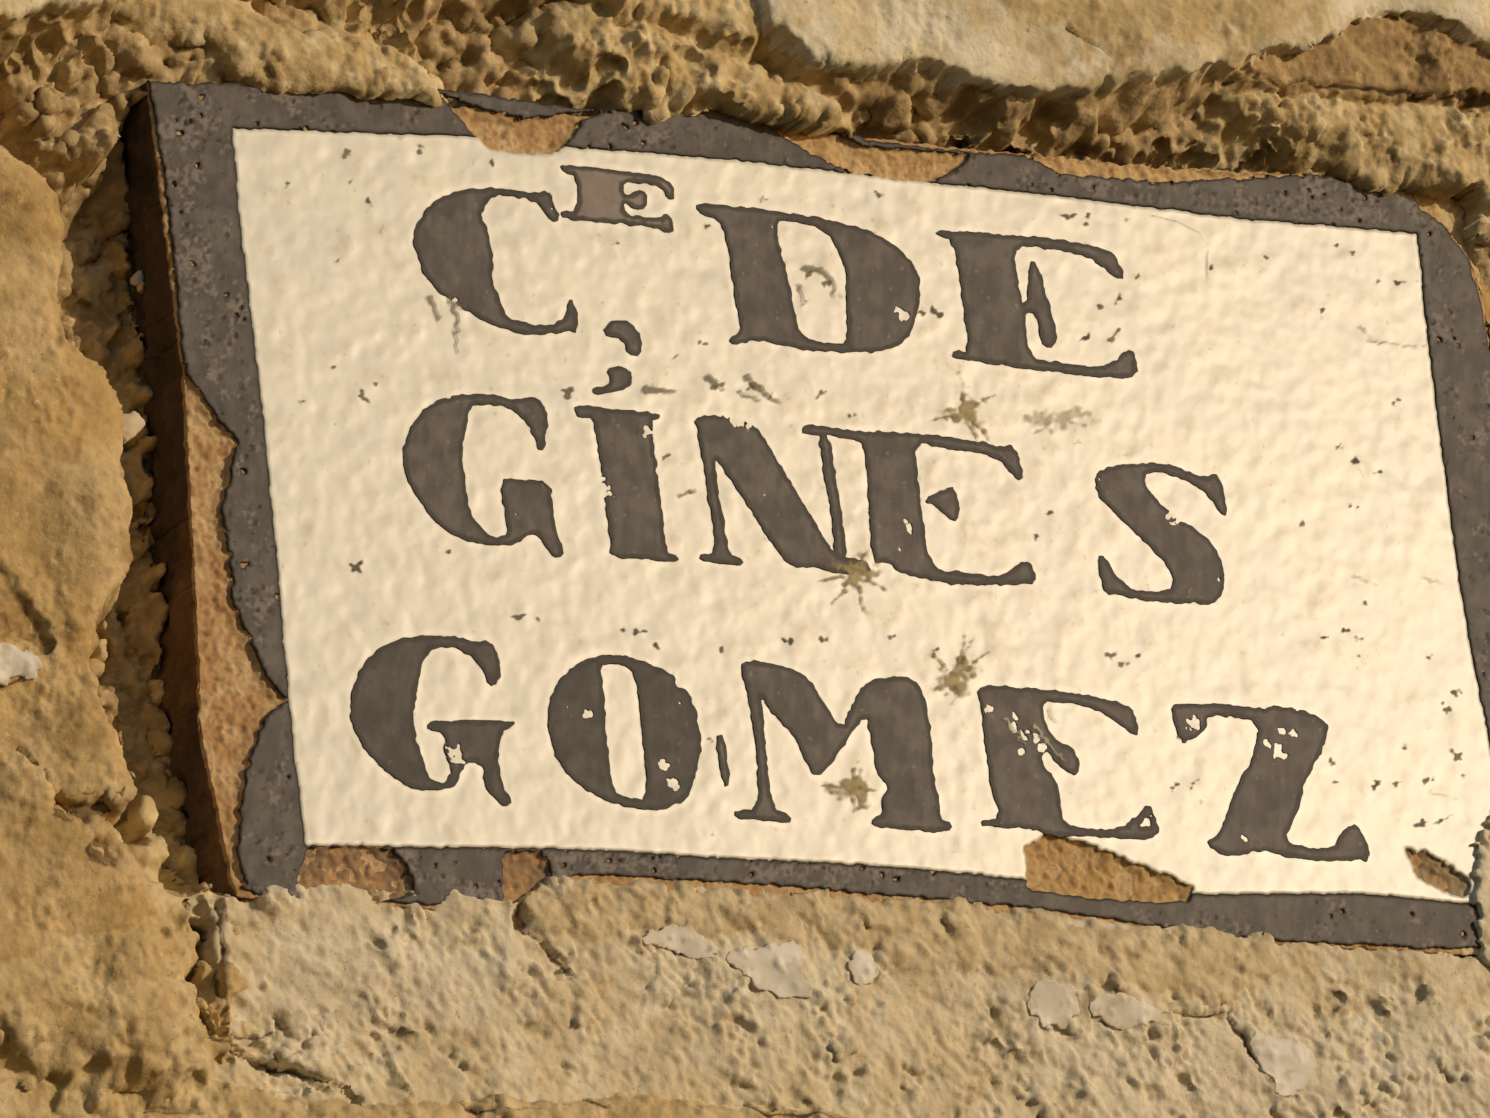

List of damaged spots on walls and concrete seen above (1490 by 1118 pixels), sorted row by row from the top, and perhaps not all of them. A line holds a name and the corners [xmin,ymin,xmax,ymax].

peeling [451,107,589,166]
peeling [502,850,550,910]
peeling [1024,834,1193,903]
peeling [1405,849,1470,897]